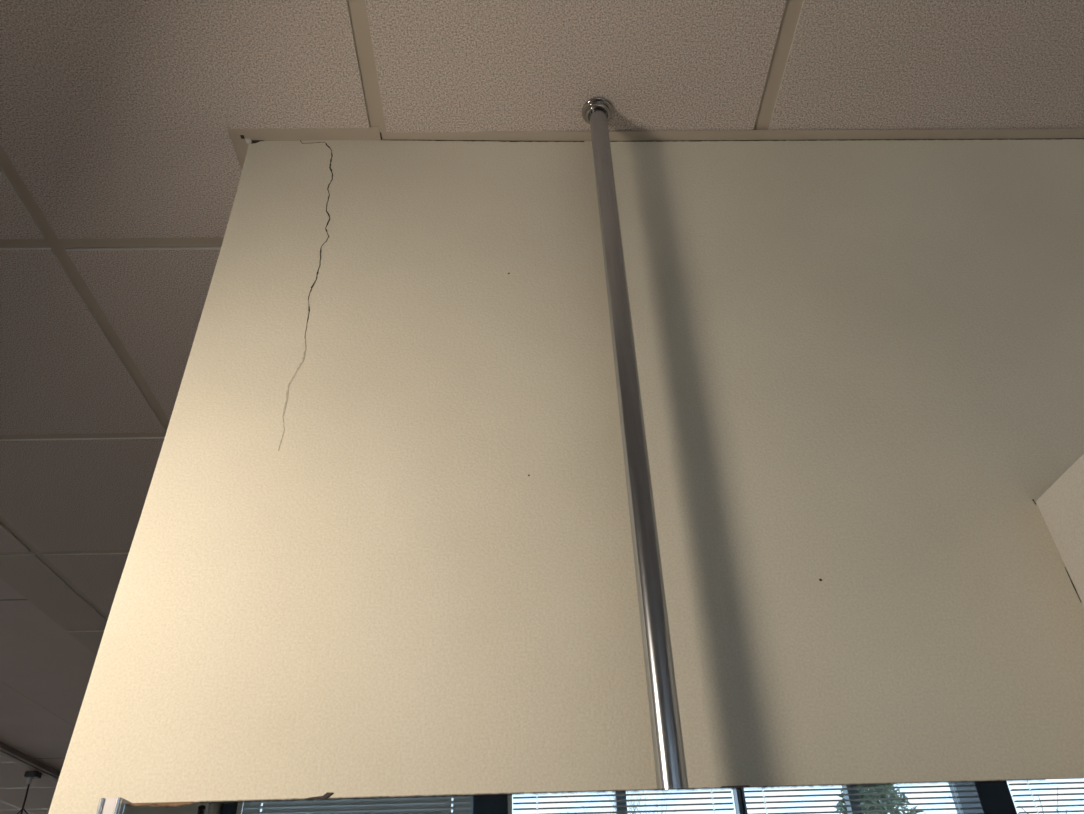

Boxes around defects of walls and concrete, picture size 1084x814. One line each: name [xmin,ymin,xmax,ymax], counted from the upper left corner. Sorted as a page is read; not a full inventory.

crack [278,140,333,451]